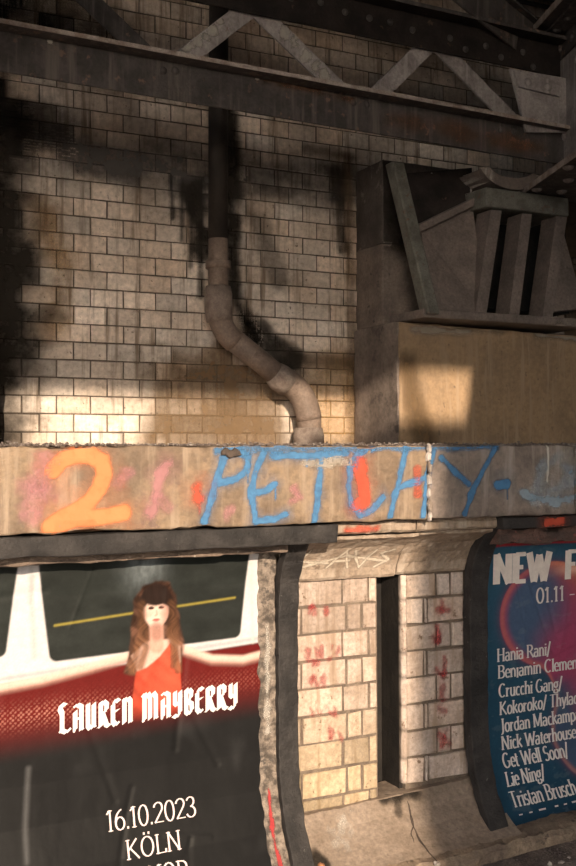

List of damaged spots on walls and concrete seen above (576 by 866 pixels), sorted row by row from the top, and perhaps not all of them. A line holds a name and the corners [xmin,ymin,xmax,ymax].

leakage [329,162,354,280]
crack [407,801,437,861]